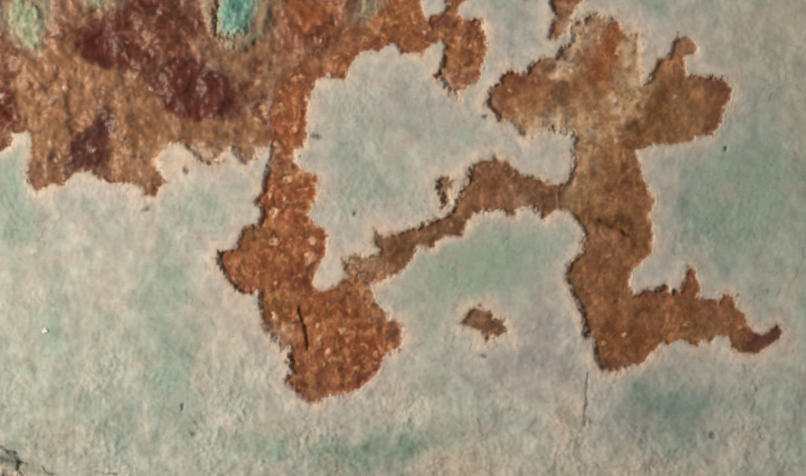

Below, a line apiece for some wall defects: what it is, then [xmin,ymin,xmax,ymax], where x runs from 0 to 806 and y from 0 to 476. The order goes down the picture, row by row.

spalling [0,0,361,214]
corrosion [215,0,787,407]